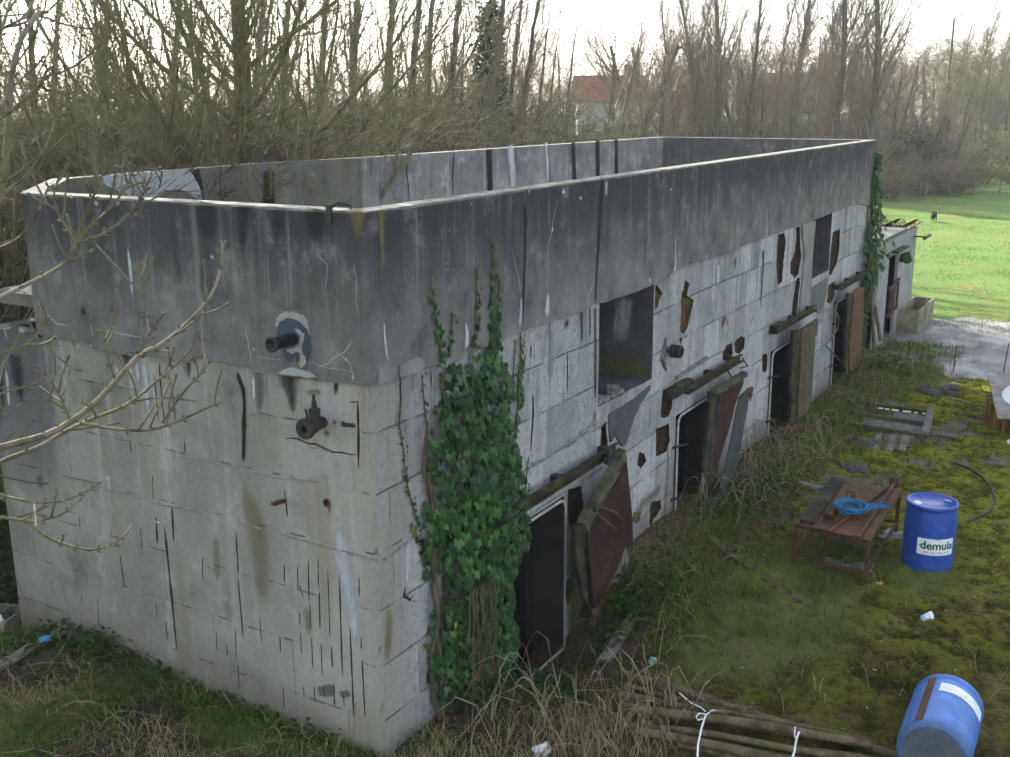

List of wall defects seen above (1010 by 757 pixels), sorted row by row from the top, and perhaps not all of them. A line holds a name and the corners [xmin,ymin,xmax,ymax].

spalling [655,285,663,309]
spalling [680,281,694,344]
spalling [776,227,801,284]
spalling [827,229,840,304]
spalling [660,338,668,372]
spalling [637,386,672,469]